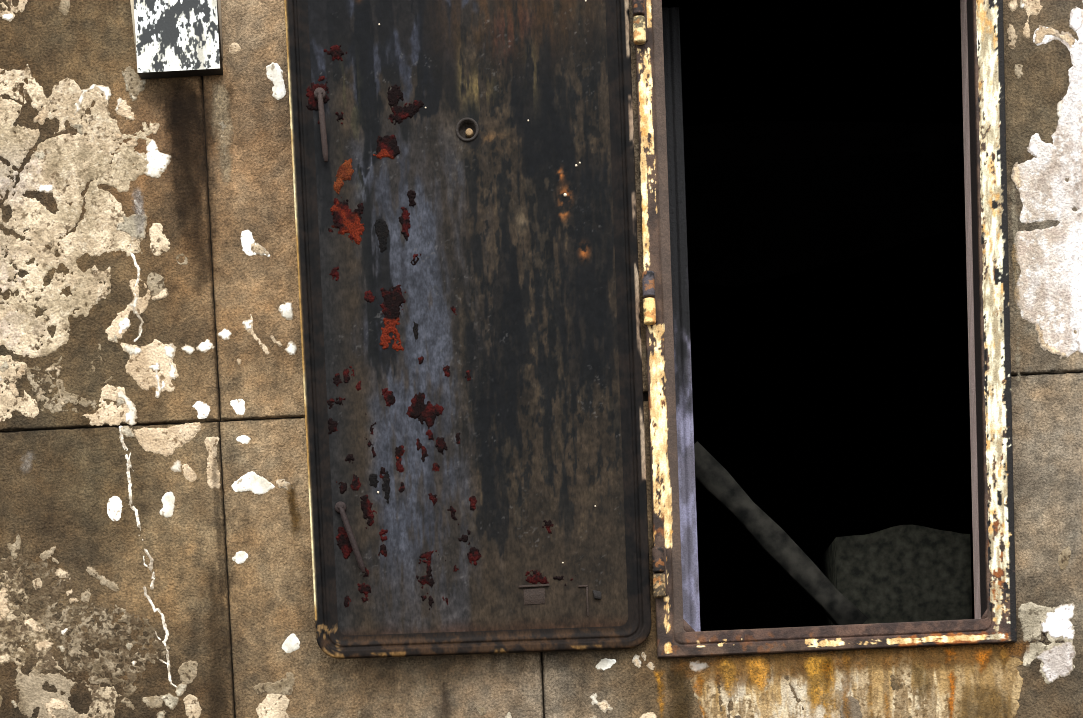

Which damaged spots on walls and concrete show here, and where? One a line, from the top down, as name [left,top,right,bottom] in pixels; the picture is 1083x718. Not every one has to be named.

peeling [0,0,28,22]
crack [130,200,144,342]
peeling [0,62,297,494]
corrosion [328,158,365,245]
corrosion [364,284,406,351]
corrosion [398,190,416,241]
peeling [1007,0,1083,359]
corrosion [364,392,461,493]
crack [119,426,176,687]
peeling [0,533,202,718]
peeling [689,602,1076,718]
corrosion [913,643,1028,718]